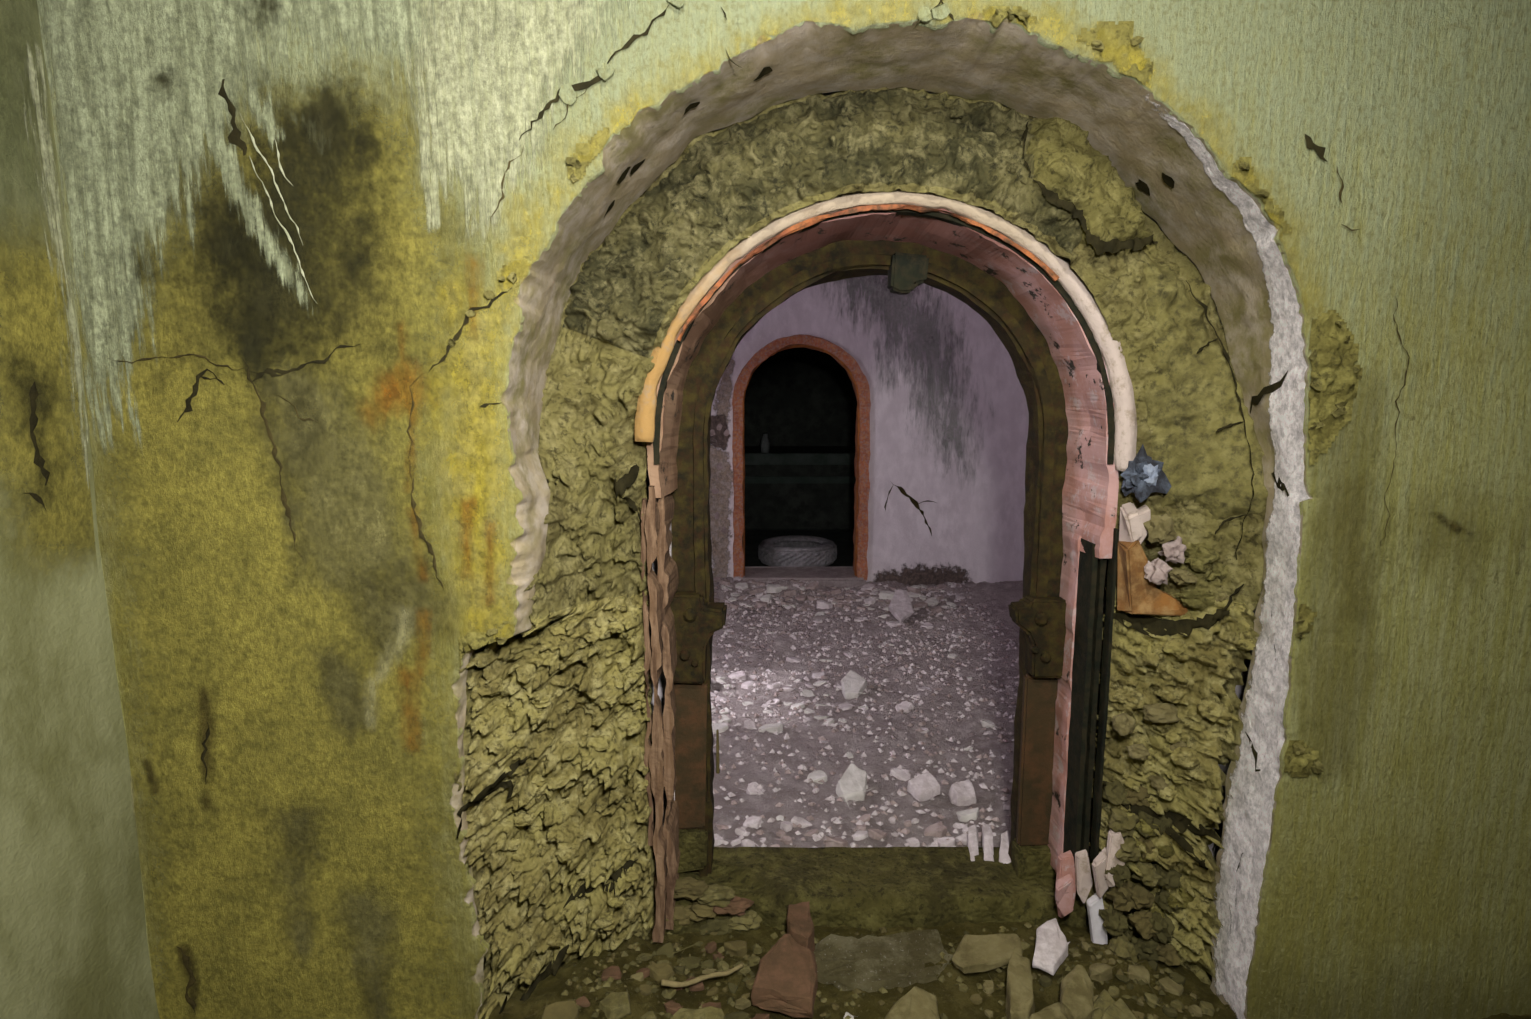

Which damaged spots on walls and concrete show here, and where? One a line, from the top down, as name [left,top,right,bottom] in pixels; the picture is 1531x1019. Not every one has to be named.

water stain [156,74,170,89]
crack [491,0,685,217]
spalling [562,88,1082,359]
crack [108,343,361,556]
water stain [0,88,535,1019]
crack [407,289,510,588]
flaking render [709,359,735,578]
spalling [1077,21,1363,1019]
spalling [456,588,656,1019]